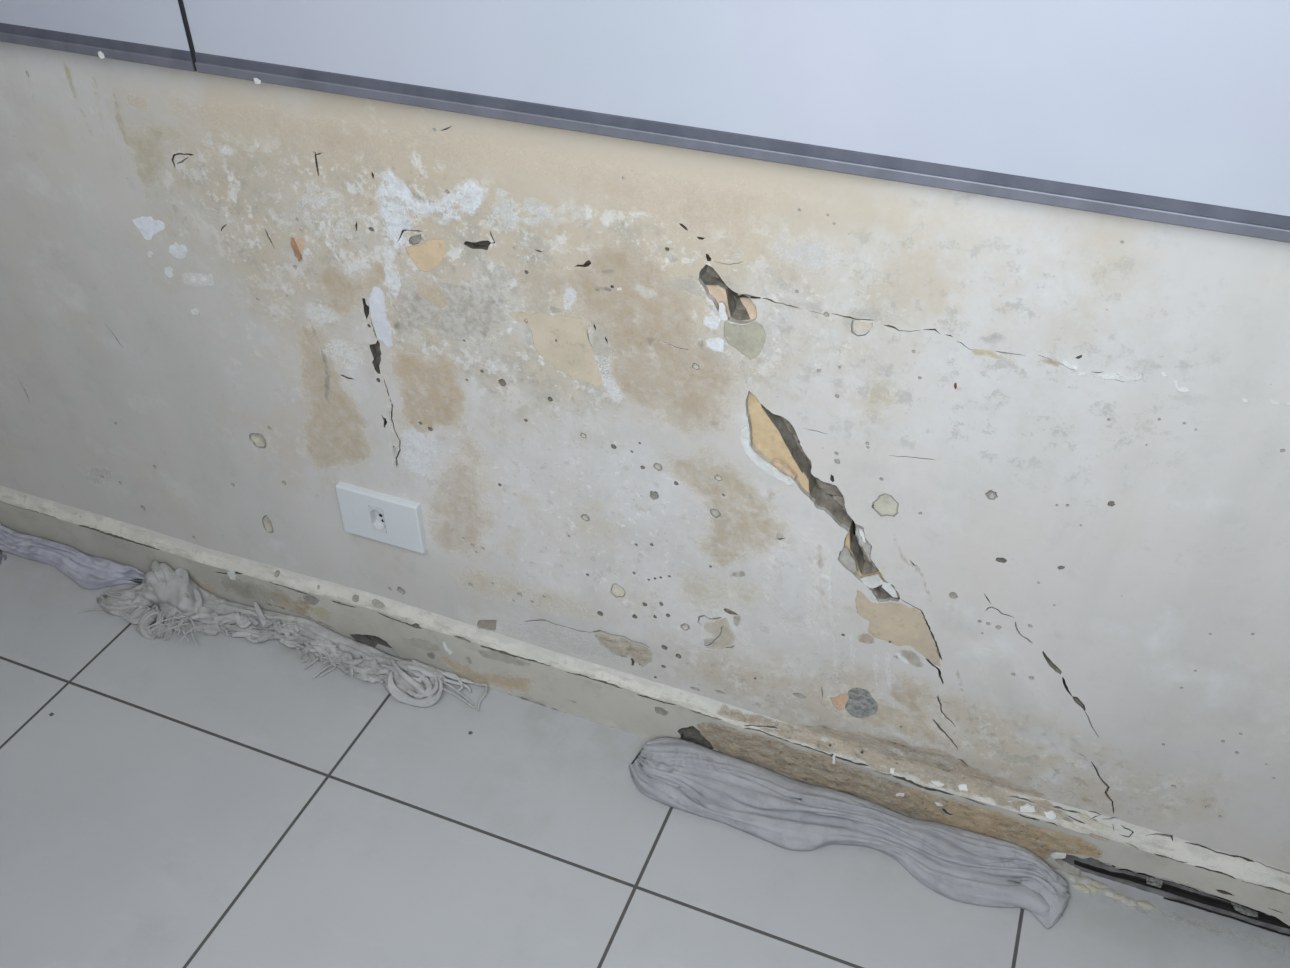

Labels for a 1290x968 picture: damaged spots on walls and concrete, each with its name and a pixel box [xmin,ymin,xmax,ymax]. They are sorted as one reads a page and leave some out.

peeling [368,286,393,347]
crack [362,298,401,466]
peeling [463,219,495,250]
water stain [261,112,757,466]
flaking render [679,223,766,360]
crack [762,298,1190,392]
water stain [674,457,785,576]
spalling [678,726,713,749]
flaking render [821,687,878,719]
water stain [697,676,1102,859]
crack [984,594,1114,840]
spalling [1050,853,1290,937]